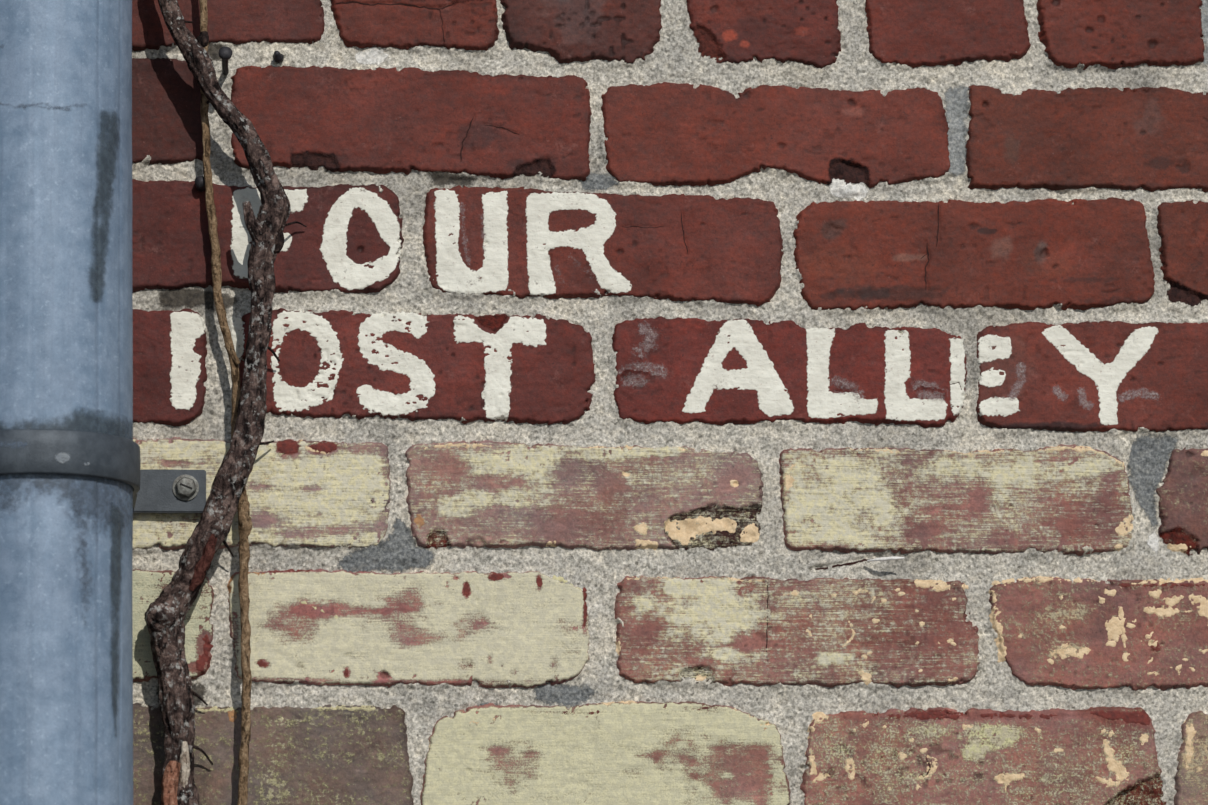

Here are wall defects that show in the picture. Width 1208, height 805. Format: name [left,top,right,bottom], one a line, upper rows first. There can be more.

peeling [409,443,762,551]
peeling [616,576,979,685]
peeling [989,576,1208,688]
peeling [193,700,790,805]
peeling [805,709,1166,805]
peeling [1177,713,1208,805]